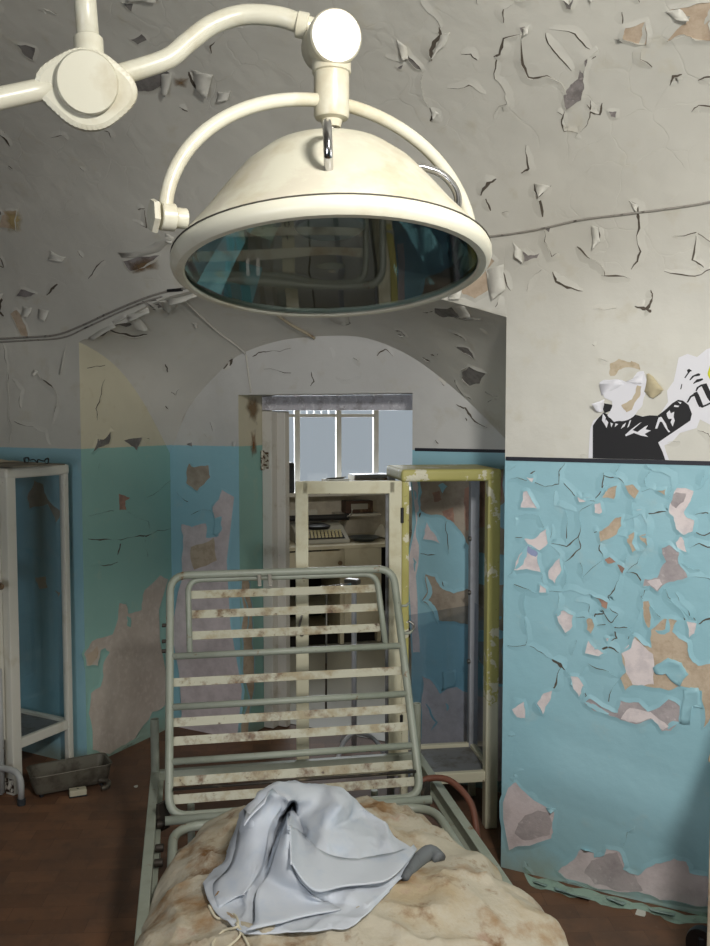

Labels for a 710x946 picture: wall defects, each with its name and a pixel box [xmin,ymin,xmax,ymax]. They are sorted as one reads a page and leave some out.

peeling [135,69,231,102]
crack [670,74,710,113]
peeling [411,254,513,322]
crack [476,174,509,218]
crack [522,145,710,317]
crack [12,347,66,445]
flaking render [82,487,255,757]
peeling [409,481,485,669]
peeling [490,466,566,596]
flaking render [553,480,710,735]
flaking render [498,582,558,853]
flaking render [521,844,709,924]